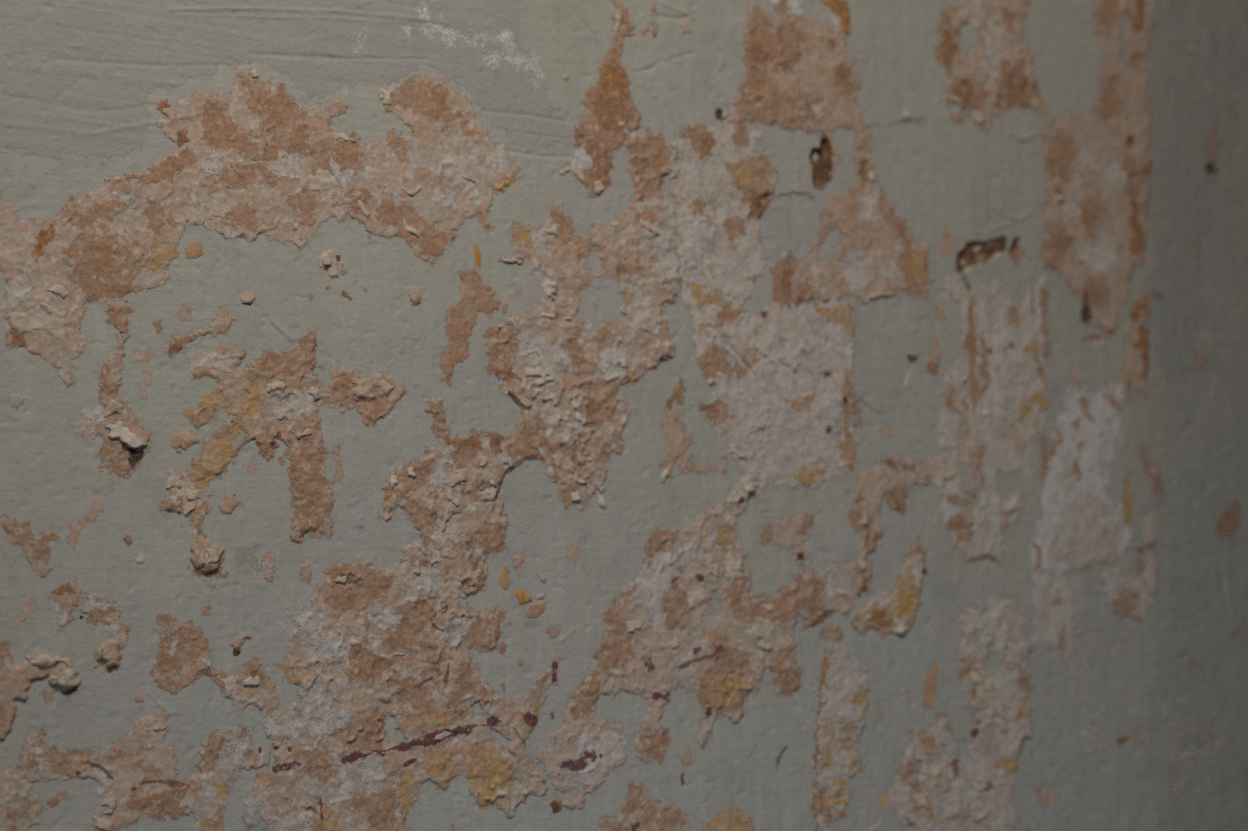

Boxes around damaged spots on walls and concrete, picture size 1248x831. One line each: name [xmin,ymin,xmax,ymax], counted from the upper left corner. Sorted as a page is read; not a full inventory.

peeling [0,0,680,831]
peeling [536,0,1159,831]